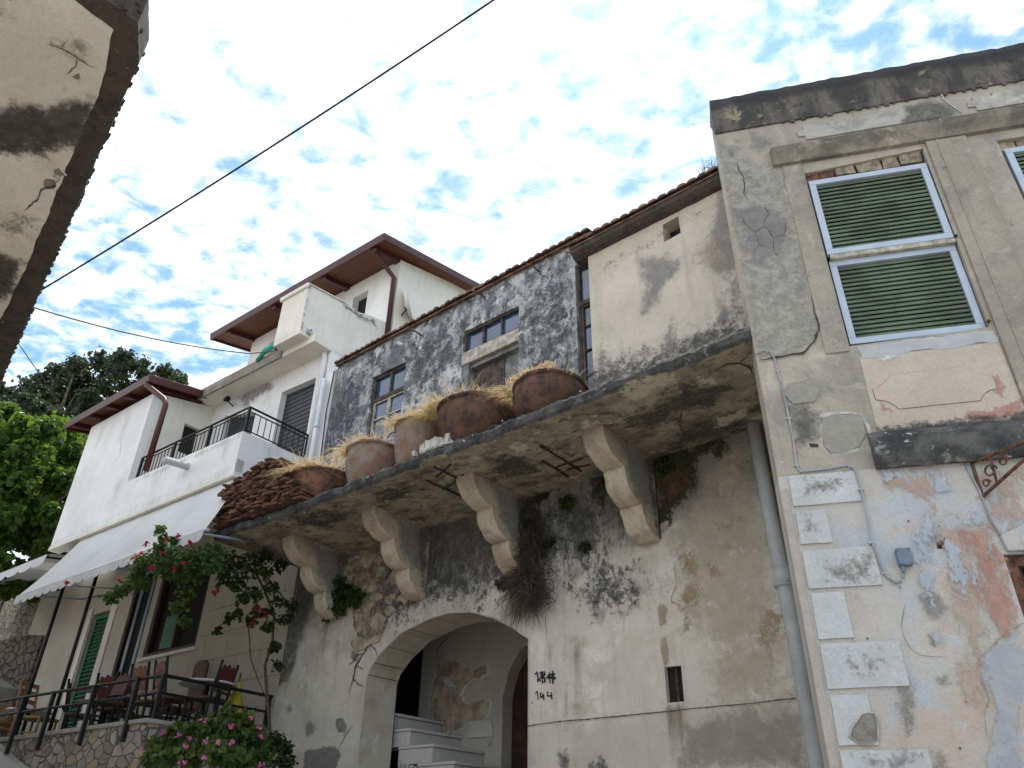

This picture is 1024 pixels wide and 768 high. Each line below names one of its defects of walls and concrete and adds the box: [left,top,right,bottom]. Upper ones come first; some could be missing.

crack [50,41,94,74]
leakage [0,101,100,155]
crack [25,174,61,210]
crack [737,163,791,258]
leakage [514,265,573,370]
leakage [581,301,746,389]
spalling [509,437,599,480]
flaking render [344,551,408,663]
leakage [369,517,503,635]
leakage [517,481,645,616]
peeling [881,466,1024,666]
flaking render [848,712,880,746]